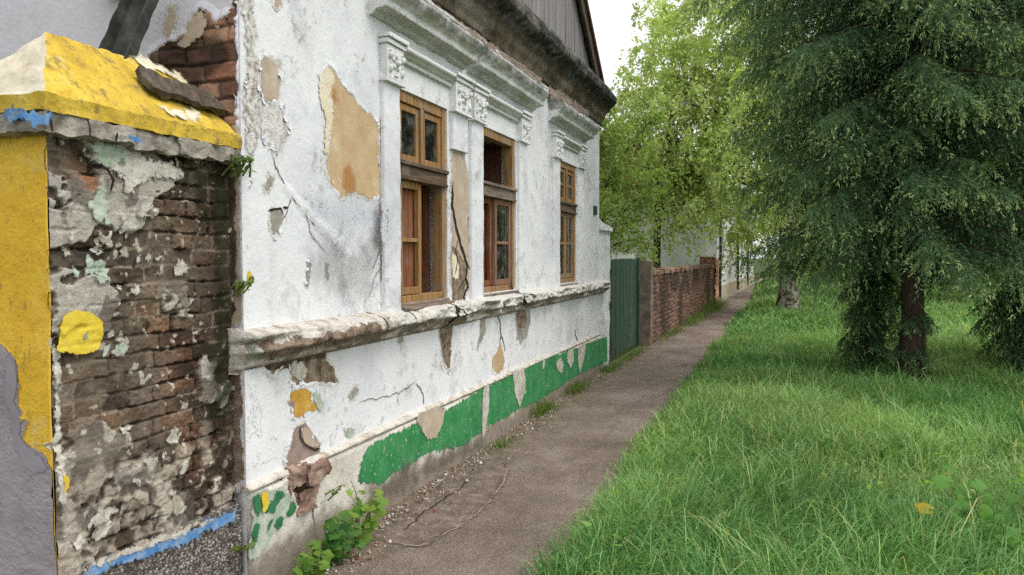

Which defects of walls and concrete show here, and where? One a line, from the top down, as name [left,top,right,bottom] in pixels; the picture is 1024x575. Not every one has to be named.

peeling [61,186,189,295]
peeling [80,134,184,194]
flaking render [129,0,292,328]
spalling [318,59,391,244]
crack [441,190,470,328]
spalling [448,149,469,301]
peeling [0,309,129,575]
peeling [78,489,237,575]
peeling [230,322,383,560]
crack [360,383,424,403]
crack [374,459,509,546]
peeling [482,340,526,440]